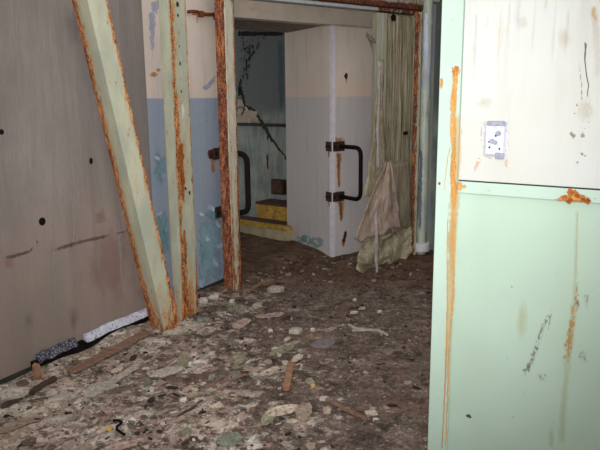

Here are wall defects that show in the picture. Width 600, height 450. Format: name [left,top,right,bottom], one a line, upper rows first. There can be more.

peeling [149,2,159,46]
crack [238,79,286,160]
rust [555,188,591,205]
peeling [198,205,223,288]
rust [442,66,466,445]